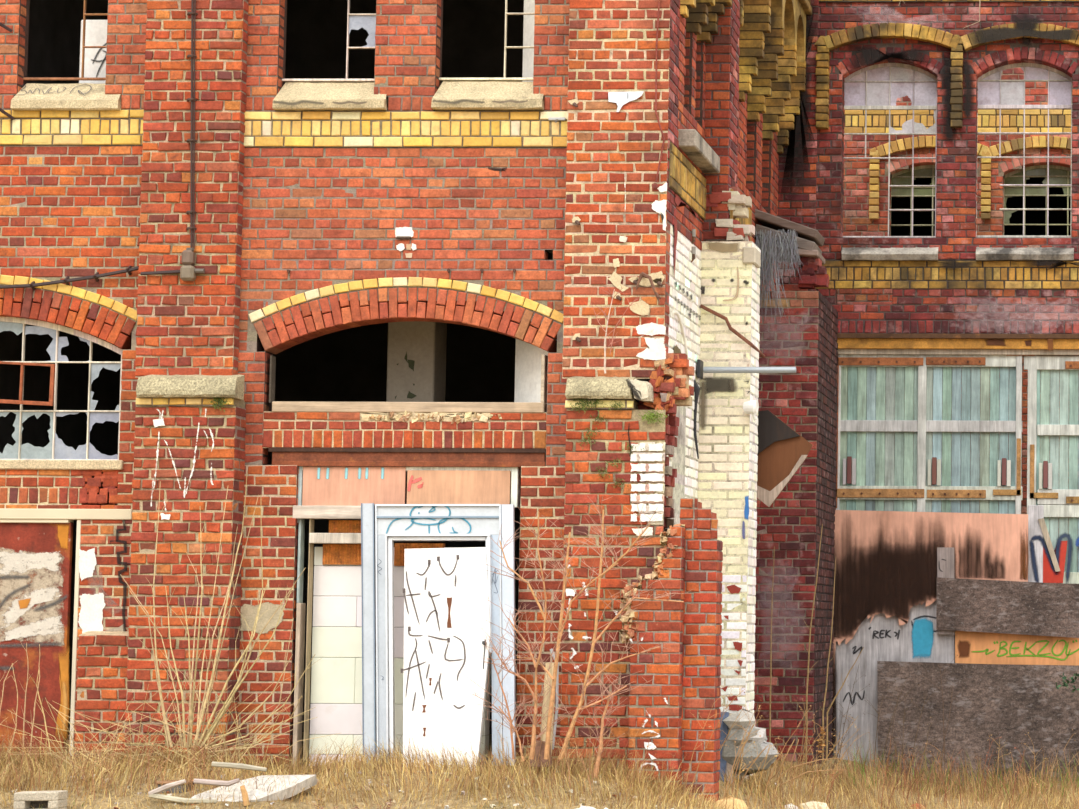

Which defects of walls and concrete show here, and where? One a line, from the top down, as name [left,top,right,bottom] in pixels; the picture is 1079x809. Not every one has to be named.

peeling [657,182,698,218]
peeling [636,219,678,287]
spalling [629,300,681,412]
peeling [630,443,664,536]
rust [58,525,69,549]
peeling [78,593,123,633]
rust [56,651,69,734]